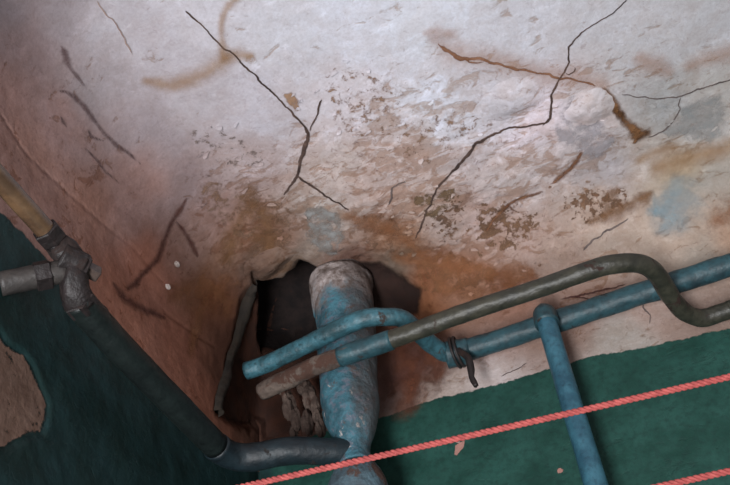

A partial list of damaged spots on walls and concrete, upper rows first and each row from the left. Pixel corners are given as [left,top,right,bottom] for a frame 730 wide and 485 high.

crack [186,11,348,210]
peeling [284,93,303,110]
peeling [327,68,392,137]
crack [416,0,627,238]
corrosion [604,88,650,144]
crack [625,80,730,138]
peeling [549,175,627,232]
crack [584,219,628,250]
spalling [214,259,317,439]
peeling [0,340,46,447]
spalling [290,375,322,417]